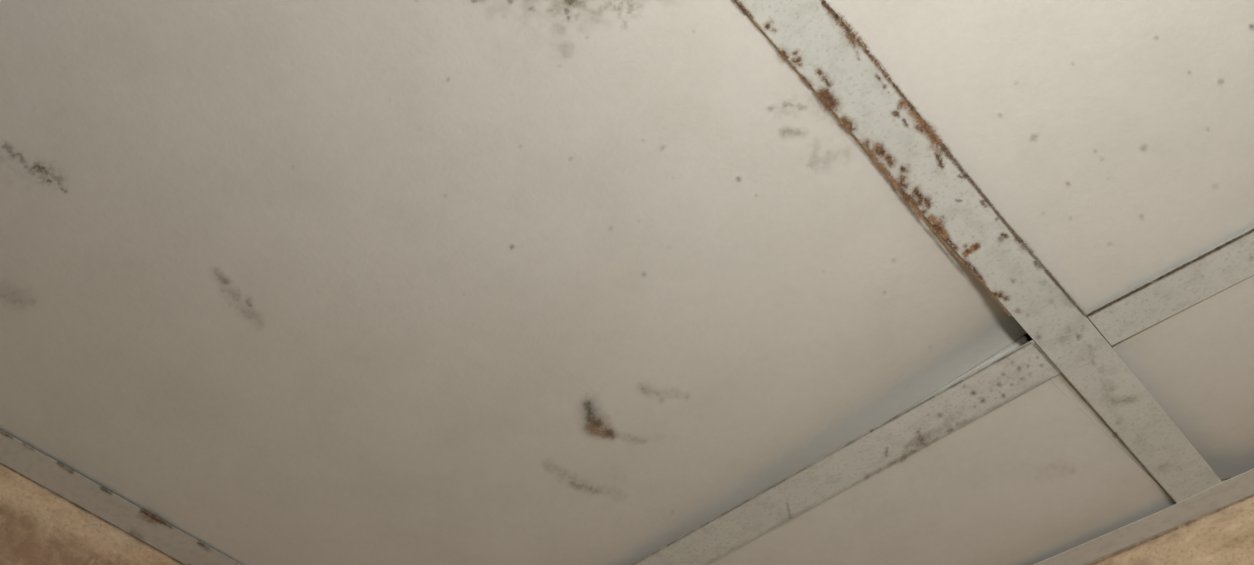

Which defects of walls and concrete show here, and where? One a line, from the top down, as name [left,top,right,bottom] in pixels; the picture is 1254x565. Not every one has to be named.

rust [734,0,1084,316]